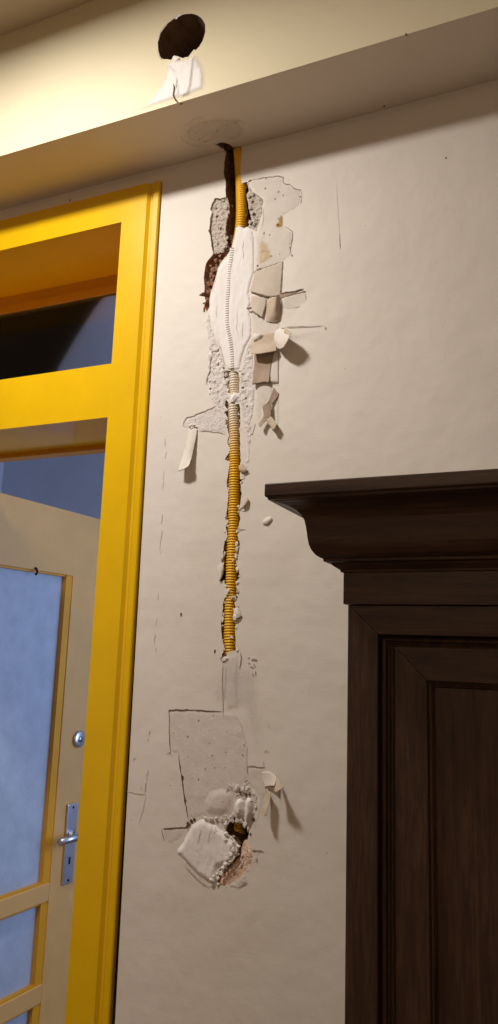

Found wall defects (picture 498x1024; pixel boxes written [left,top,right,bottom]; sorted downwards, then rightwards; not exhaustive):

peeling [247,175,302,271]
spalling [178,198,326,491]
peeling [214,497,249,654]
peeling [161,818,196,843]
spalling [183,766,284,889]